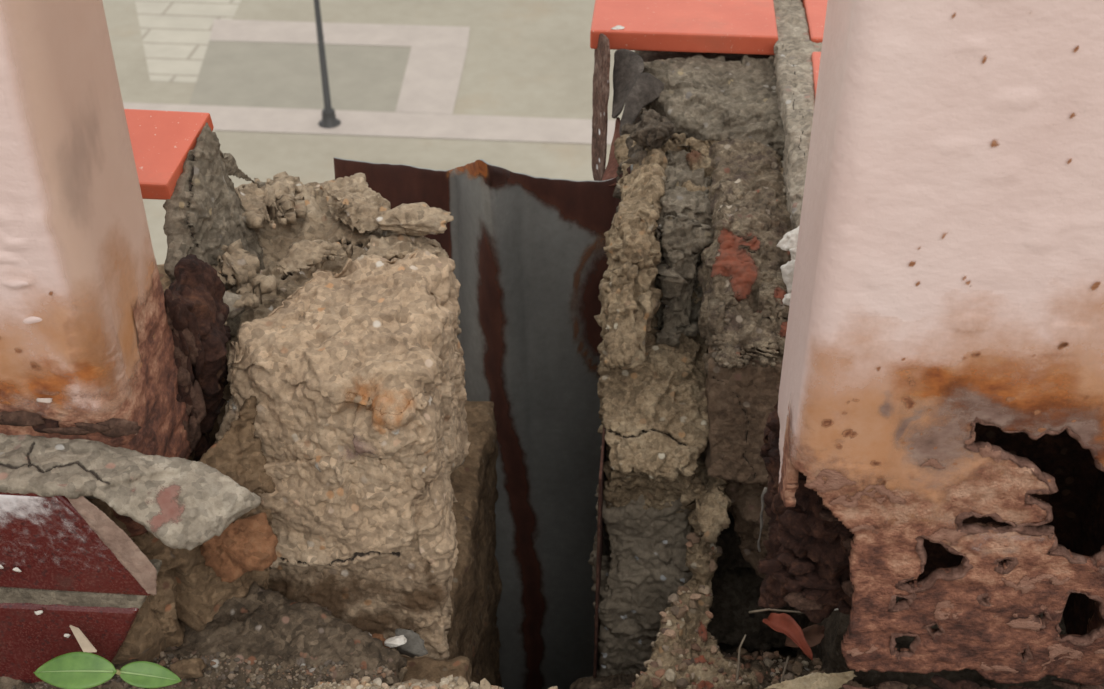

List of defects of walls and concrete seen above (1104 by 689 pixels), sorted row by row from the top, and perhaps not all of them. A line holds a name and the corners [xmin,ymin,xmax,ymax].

corrosion [0,0,232,462]
corrosion [333,158,631,376]
crack [0,442,110,485]
corrosion [113,509,148,537]
corrosion [757,342,1104,689]